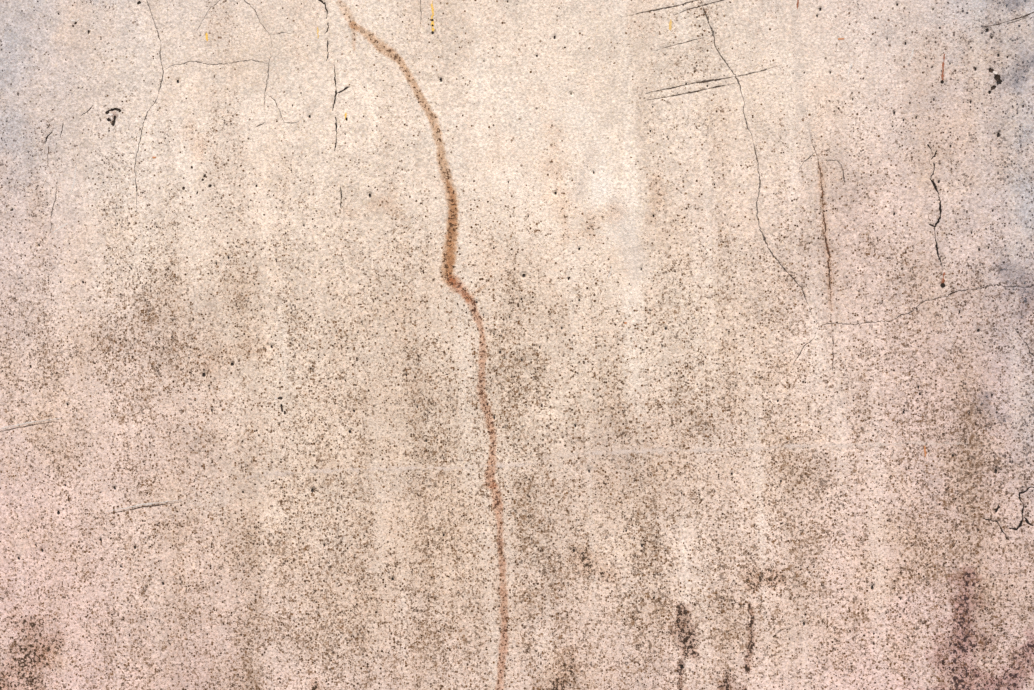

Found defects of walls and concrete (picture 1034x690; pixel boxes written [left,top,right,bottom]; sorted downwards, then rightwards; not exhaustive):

crack [134,0,296,204]
crack [319,0,349,151]
corrosion [339,1,484,320]
crack [701,1,1033,370]
corrosion [478,377,501,510]
leakage [671,603,699,690]
leakage [744,604,758,672]
leakage [932,566,1034,690]